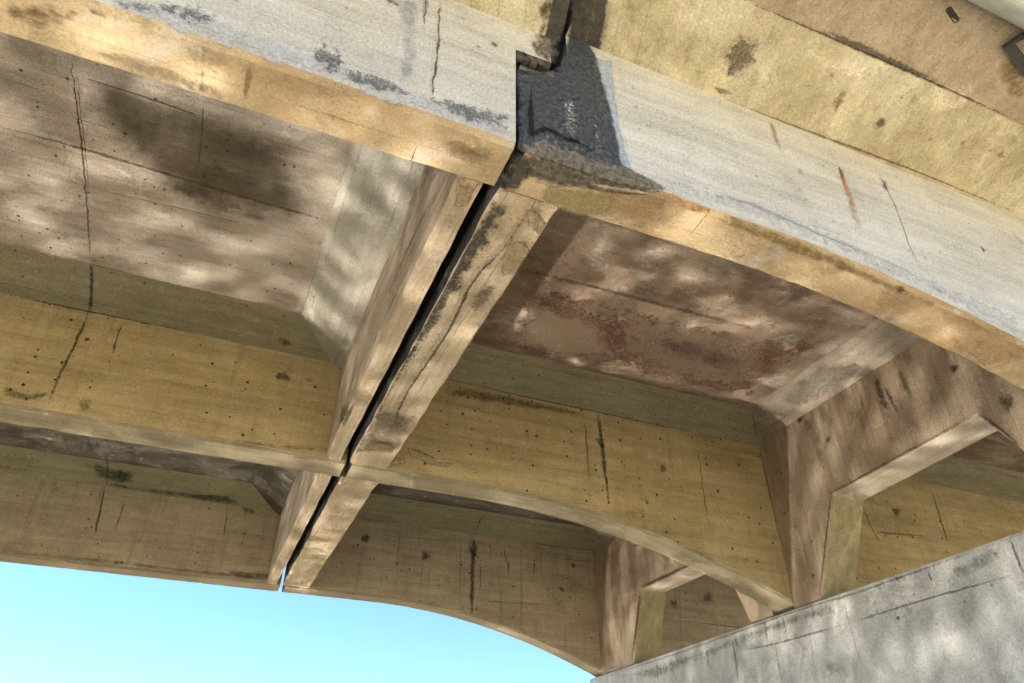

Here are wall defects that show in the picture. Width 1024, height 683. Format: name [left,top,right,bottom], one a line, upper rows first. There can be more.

crack [424,5,441,99]
damp [724,36,758,75]
damp [108,92,293,210]
crack [51,81,94,393]
corrosion [510,290,809,395]
damp [95,465,129,488]
damp [167,491,231,503]